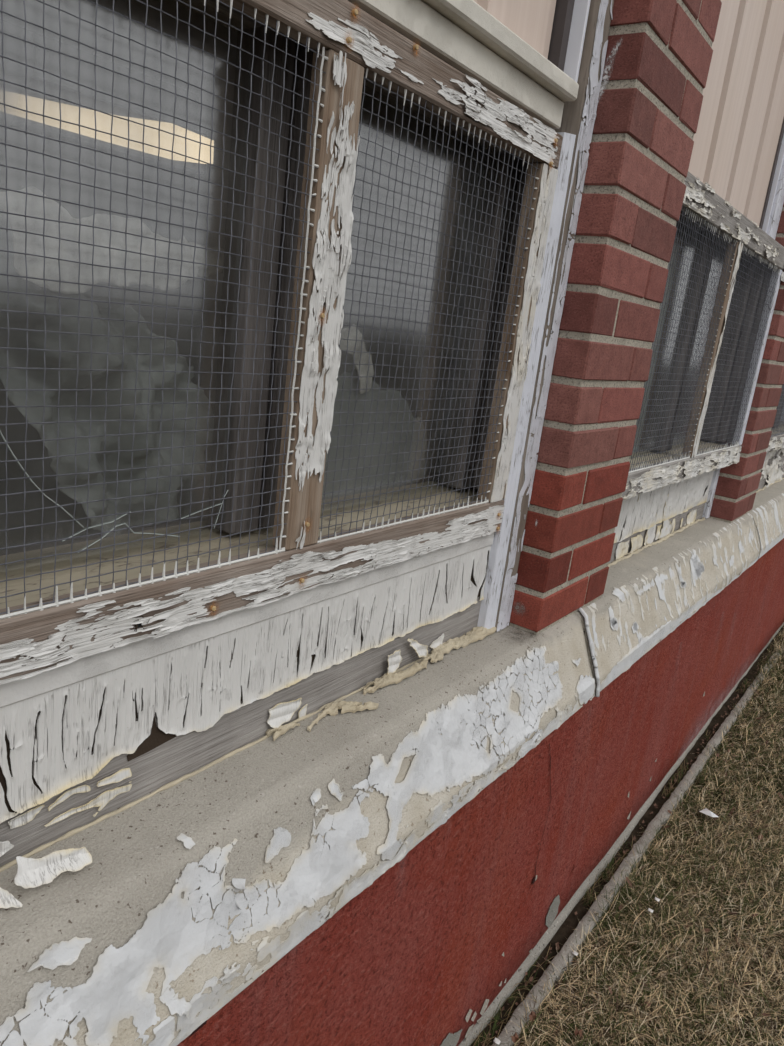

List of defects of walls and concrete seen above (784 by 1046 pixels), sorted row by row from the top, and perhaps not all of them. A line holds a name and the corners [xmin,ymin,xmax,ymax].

crack [0,0,613,824]
peeling [295,12,559,491]
peeling [616,176,784,560]
peeling [0,437,784,1046]